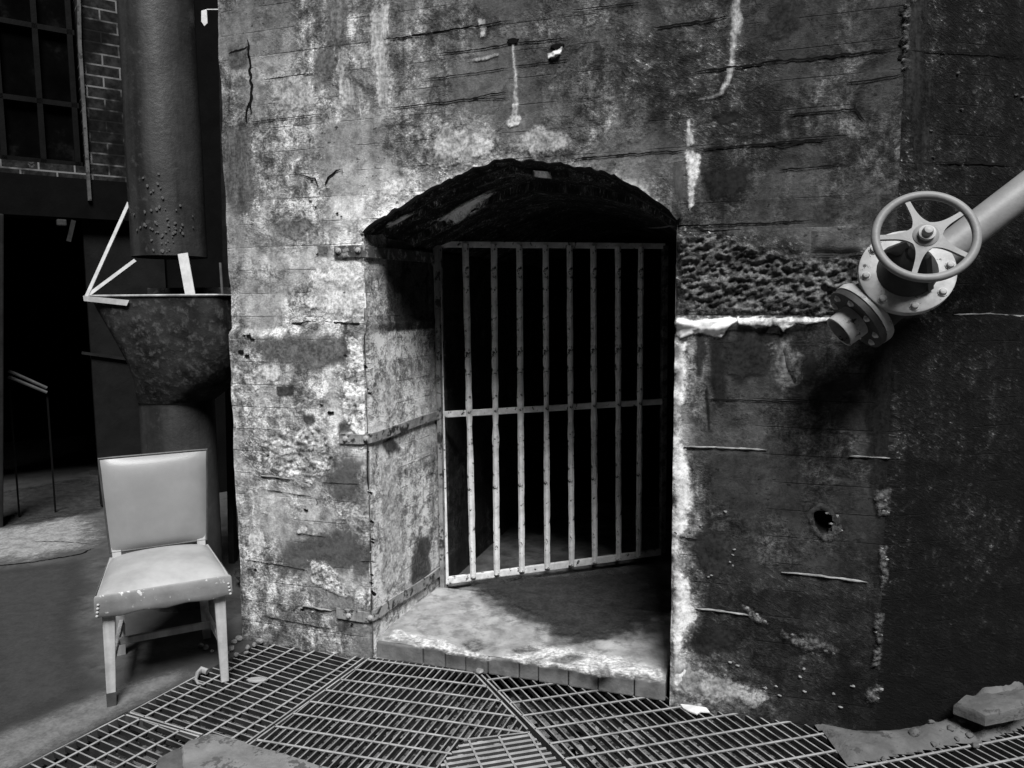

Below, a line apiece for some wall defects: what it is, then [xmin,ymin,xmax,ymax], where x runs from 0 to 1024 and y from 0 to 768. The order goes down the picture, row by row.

crack [229,40,318,122]
leakage [507,47,571,156]
leakage [702,0,742,99]
leakage [669,120,748,207]
spalling [678,233,860,315]
leakage [471,316,830,708]
spalling [810,511,843,542]